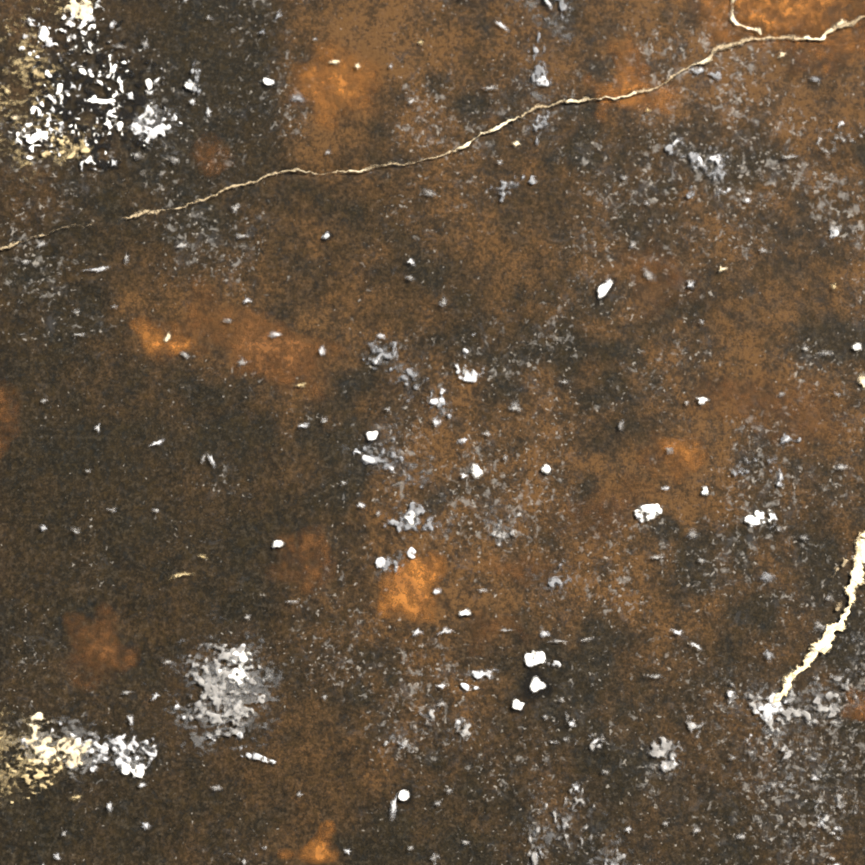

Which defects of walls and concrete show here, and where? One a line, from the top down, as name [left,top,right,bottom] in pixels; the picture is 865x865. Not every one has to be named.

rust [731,0,834,44]
spalling [0,0,182,171]
crack [126,0,865,218]
crack [0,226,68,251]
rust [143,327,189,352]
rust [381,555,439,617]
crack [773,531,865,703]